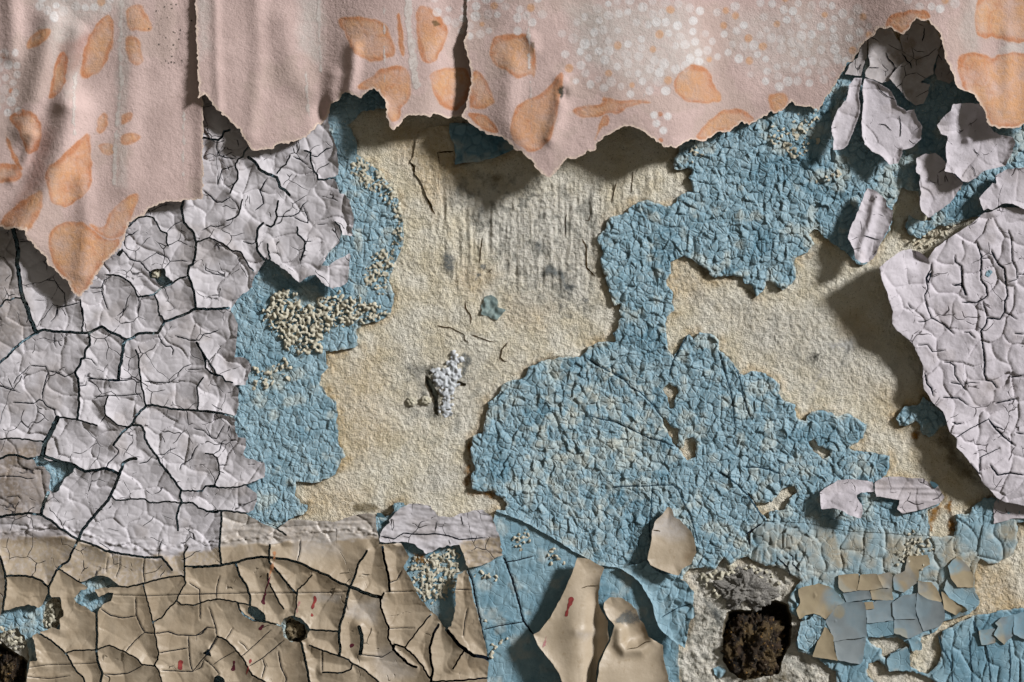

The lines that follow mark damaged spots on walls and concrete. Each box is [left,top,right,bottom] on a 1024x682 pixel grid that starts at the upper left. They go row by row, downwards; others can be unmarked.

peeling [0,88,404,682]
crack [0,94,533,682]
damp [409,350,471,418]
peeling [376,18,1024,682]
crack [908,231,1024,476]